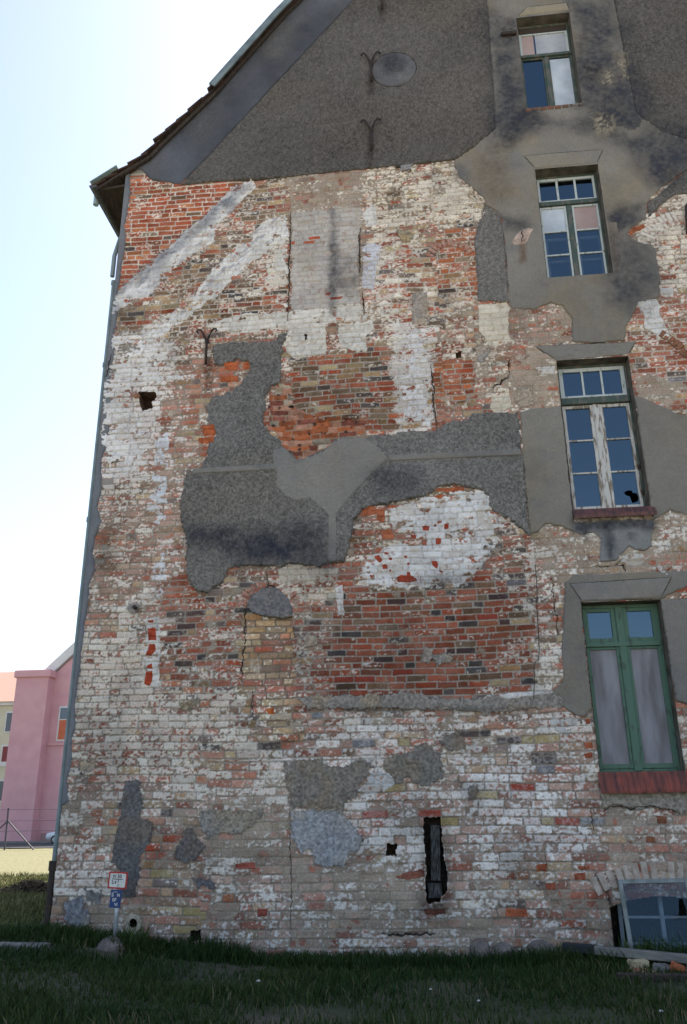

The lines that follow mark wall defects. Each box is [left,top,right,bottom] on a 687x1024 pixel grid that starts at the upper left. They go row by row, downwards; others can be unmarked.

crack [240,607,254,714]
flaking render [61,0,687,806]